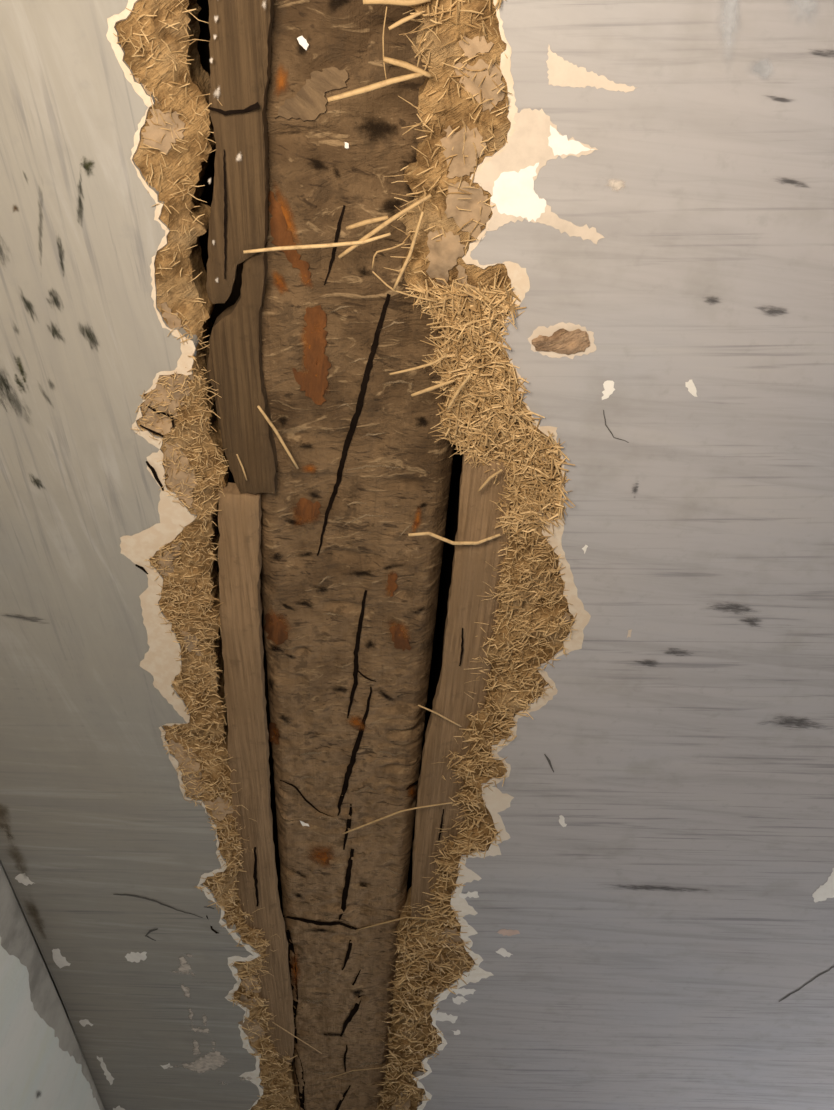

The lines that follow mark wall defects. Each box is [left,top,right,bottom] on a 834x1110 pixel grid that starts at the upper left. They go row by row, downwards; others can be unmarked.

peeling [546,45,635,93]
spalling [361,119,396,138]
leakage [77,162,93,217]
spalling [383,185,415,213]
leakage [0,359,25,395]
crack [317,294,390,556]
peeling [106,0,263,1110]
peeling [413,0,605,1110]
crack [252,847,260,906]
crack [280,590,386,1110]
peeling [812,868,834,902]
peeling [0,863,125,1110]